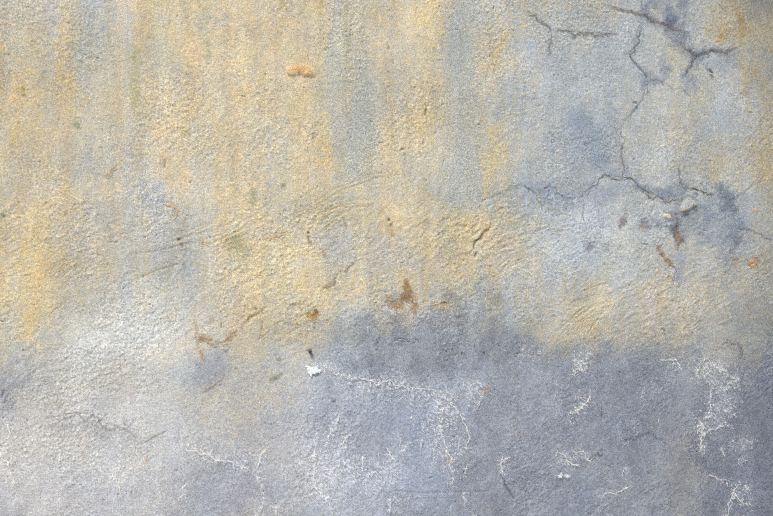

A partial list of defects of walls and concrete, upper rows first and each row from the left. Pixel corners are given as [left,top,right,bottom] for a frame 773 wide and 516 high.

crack [528,13,609,50]
crack [612,7,731,75]
crack [591,88,741,203]